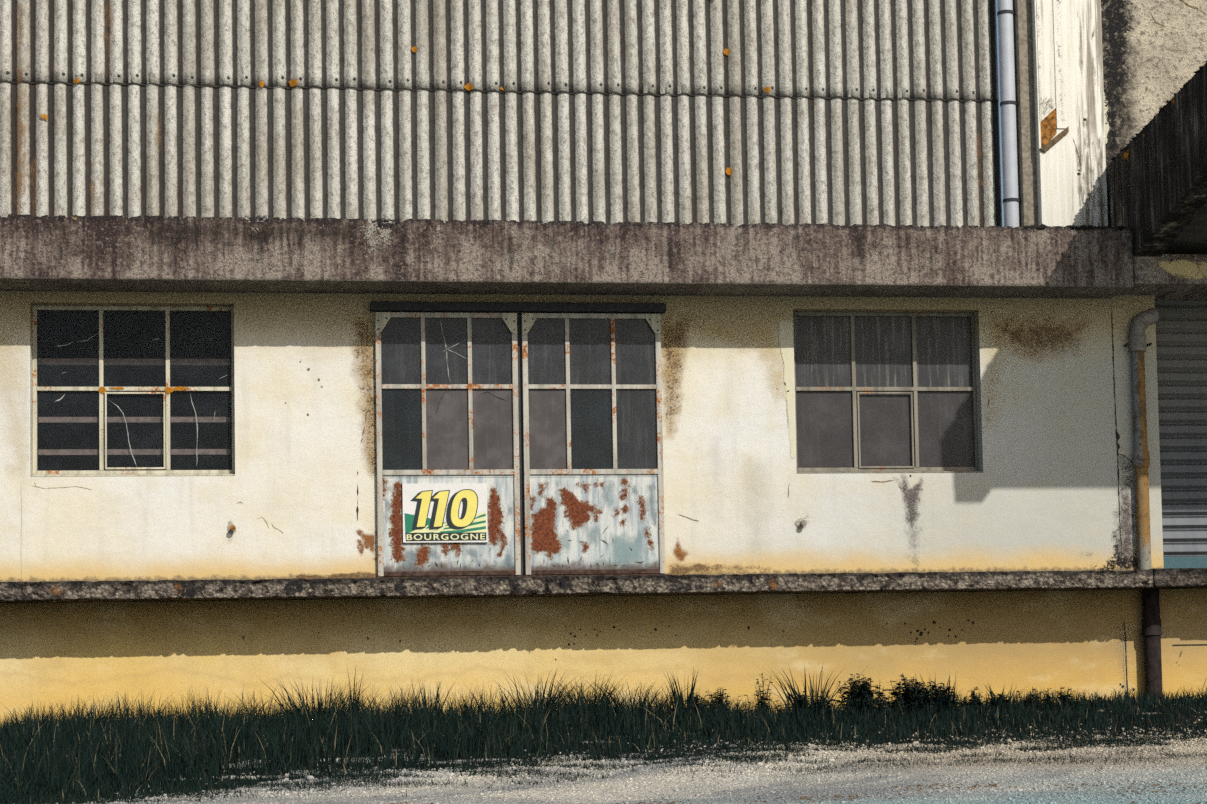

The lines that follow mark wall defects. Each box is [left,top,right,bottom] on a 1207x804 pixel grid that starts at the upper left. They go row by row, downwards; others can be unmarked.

leakage [1076,0,1135,225]
corrosion [354,318,464,566]
corrosion [487,482,508,557]
corrosion [530,478,654,559]
leakage [902,479,922,524]
leakage [1092,476,1138,570]